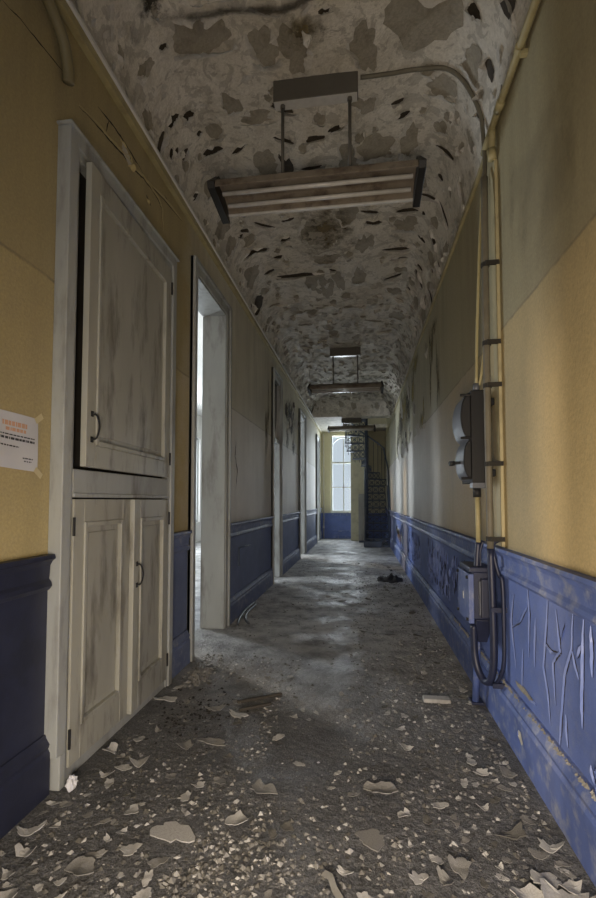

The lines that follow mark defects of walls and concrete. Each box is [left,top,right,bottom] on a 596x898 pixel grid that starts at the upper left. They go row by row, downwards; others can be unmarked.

peeling [136,14,314,80]
peeling [346,0,481,72]
peeling [487,0,517,38]
crack [79,105,183,230]
peeling [142,103,248,185]
peeling [220,85,301,126]
peeling [253,44,494,175]
peeling [203,173,465,415]
crack [510,589,594,748]
crack [588,765,596,785]